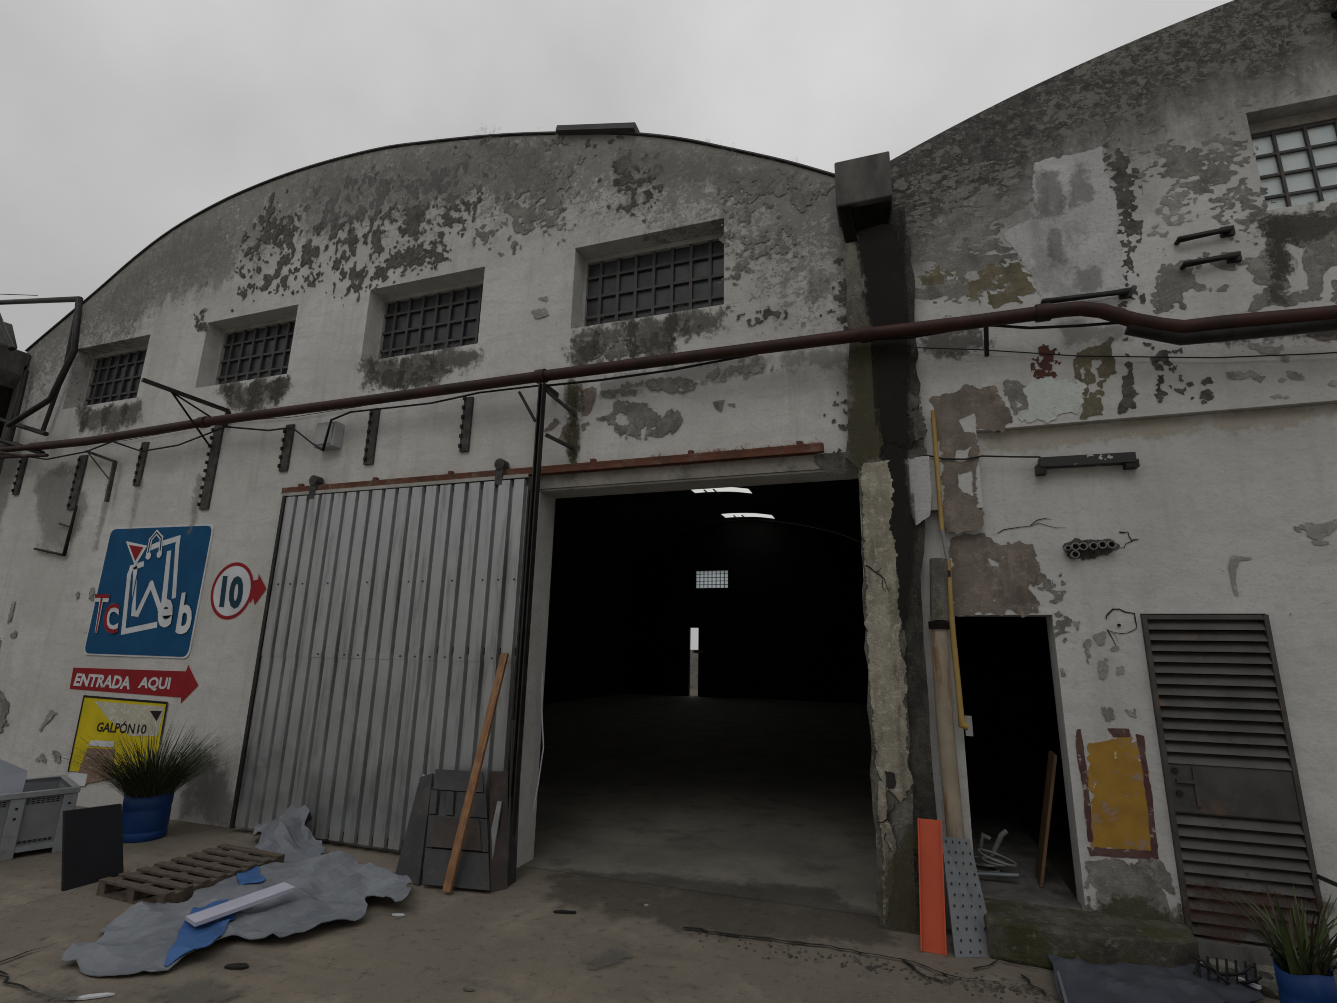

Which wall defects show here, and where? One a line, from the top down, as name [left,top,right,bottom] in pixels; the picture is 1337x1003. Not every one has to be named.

leakage [565,306,728,367]
peeling [544,355,783,443]
peeling [1073,336,1305,419]
corrosion [541,442,822,476]
peeling [903,379,1125,680]
peeling [1294,519,1337,545]